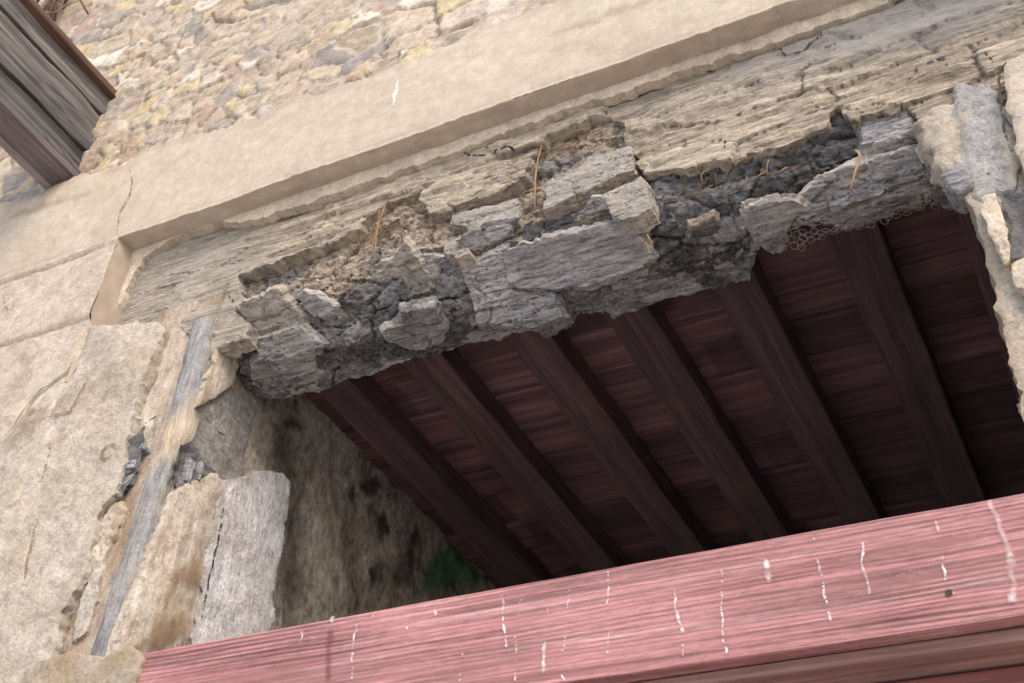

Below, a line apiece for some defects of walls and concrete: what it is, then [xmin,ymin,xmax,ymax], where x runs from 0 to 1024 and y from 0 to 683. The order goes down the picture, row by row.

crack [772,35,835,57]
peeling [194,111,952,408]
crack [201,508,224,618]